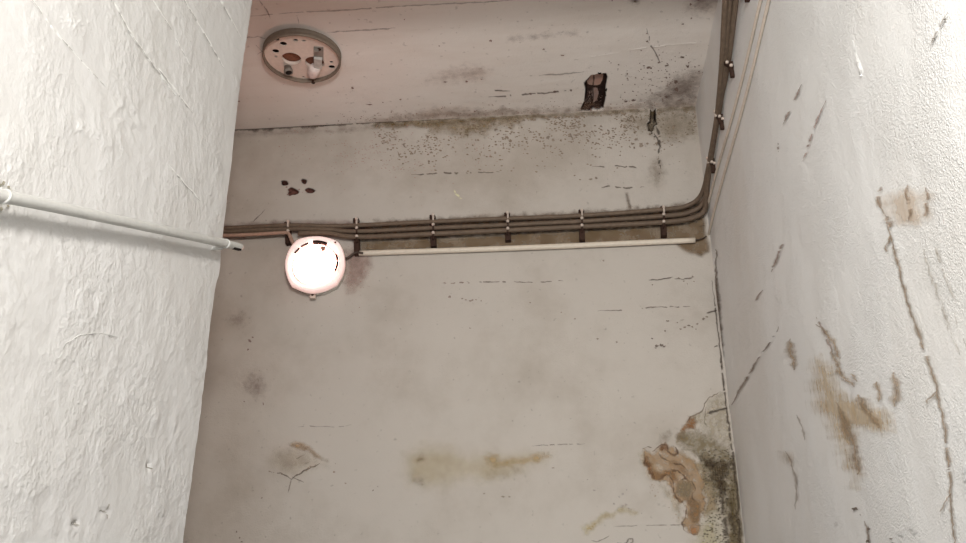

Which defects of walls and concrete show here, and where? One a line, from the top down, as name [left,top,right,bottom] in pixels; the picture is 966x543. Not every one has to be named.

peeling [324,72,697,193]
leakage [683,435,742,543]